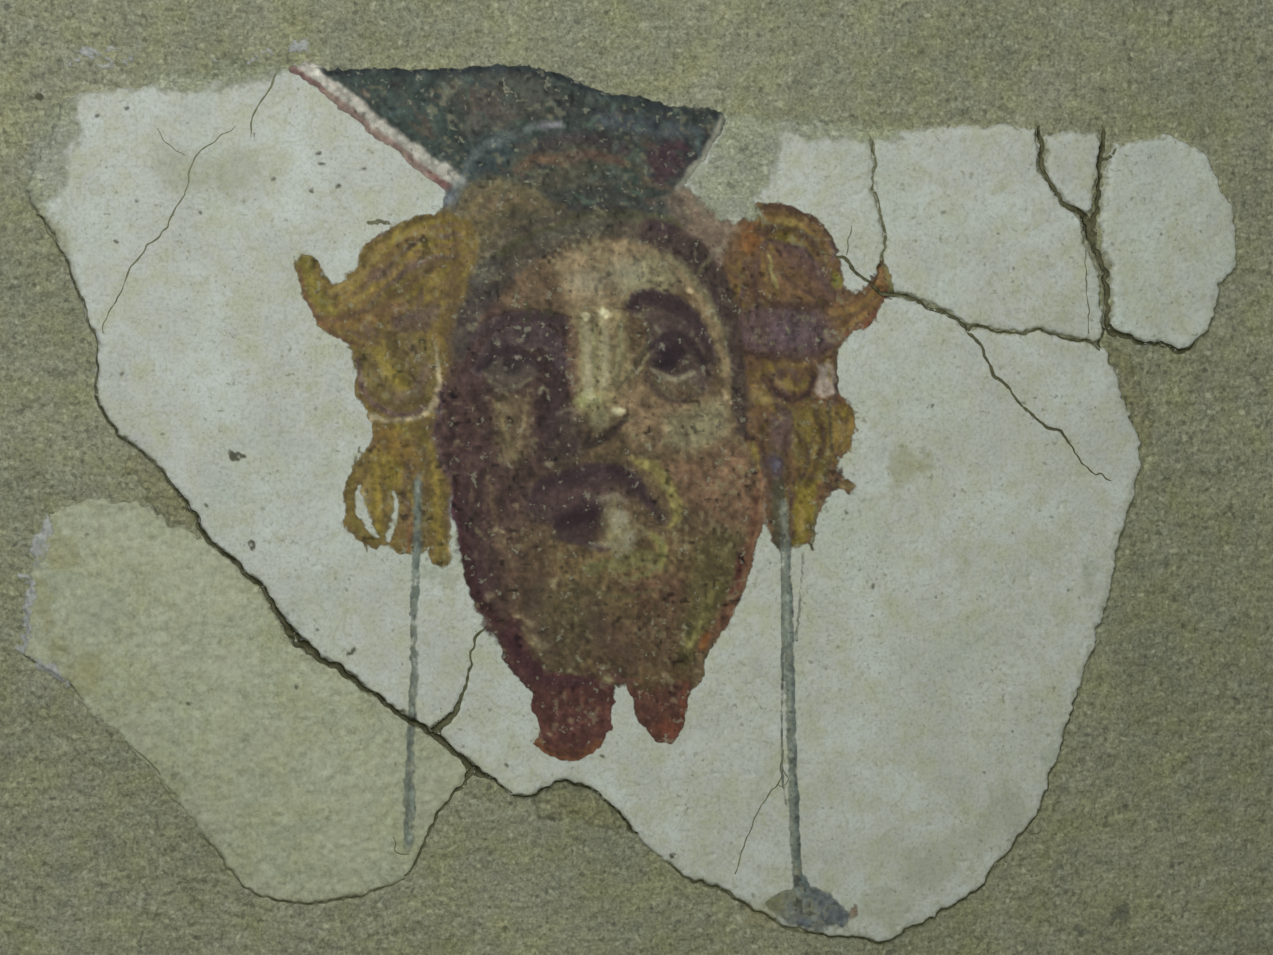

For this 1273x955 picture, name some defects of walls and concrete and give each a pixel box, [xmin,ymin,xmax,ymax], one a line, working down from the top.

crack [36,72,638,905]
crack [819,125,1195,481]